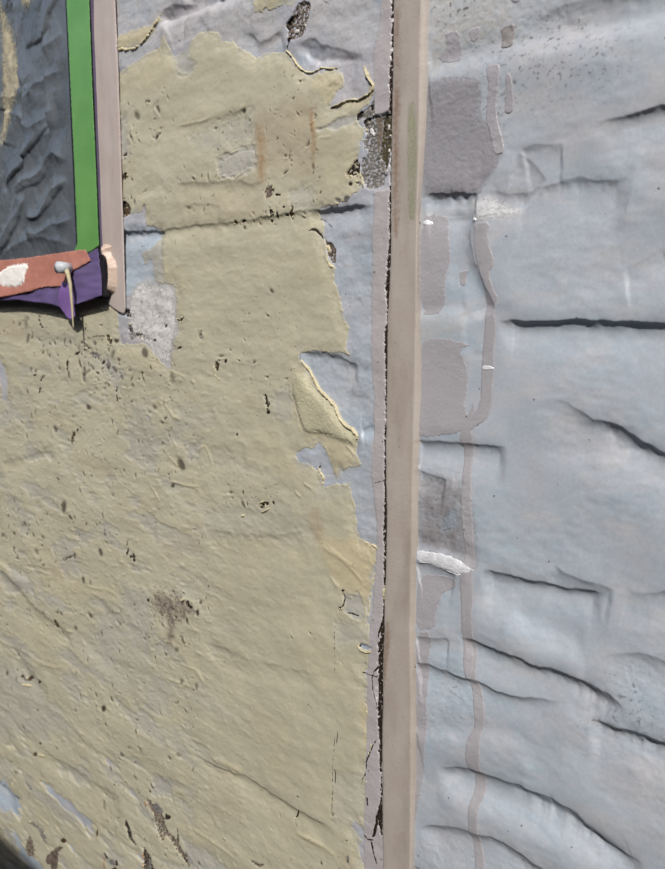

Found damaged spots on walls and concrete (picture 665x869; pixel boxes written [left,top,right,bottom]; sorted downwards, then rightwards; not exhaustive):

peeling [118,14,162,52]
spalling [285,1,340,74]
crack [387,0,395,113]
spalling [330,66,392,204]
spalling [264,186,294,222]
spalling [308,228,336,268]
peeling [125,282,184,363]
crack [362,160,391,864]
peeling [338,567,386,620]
spalling [25,821,66,869]